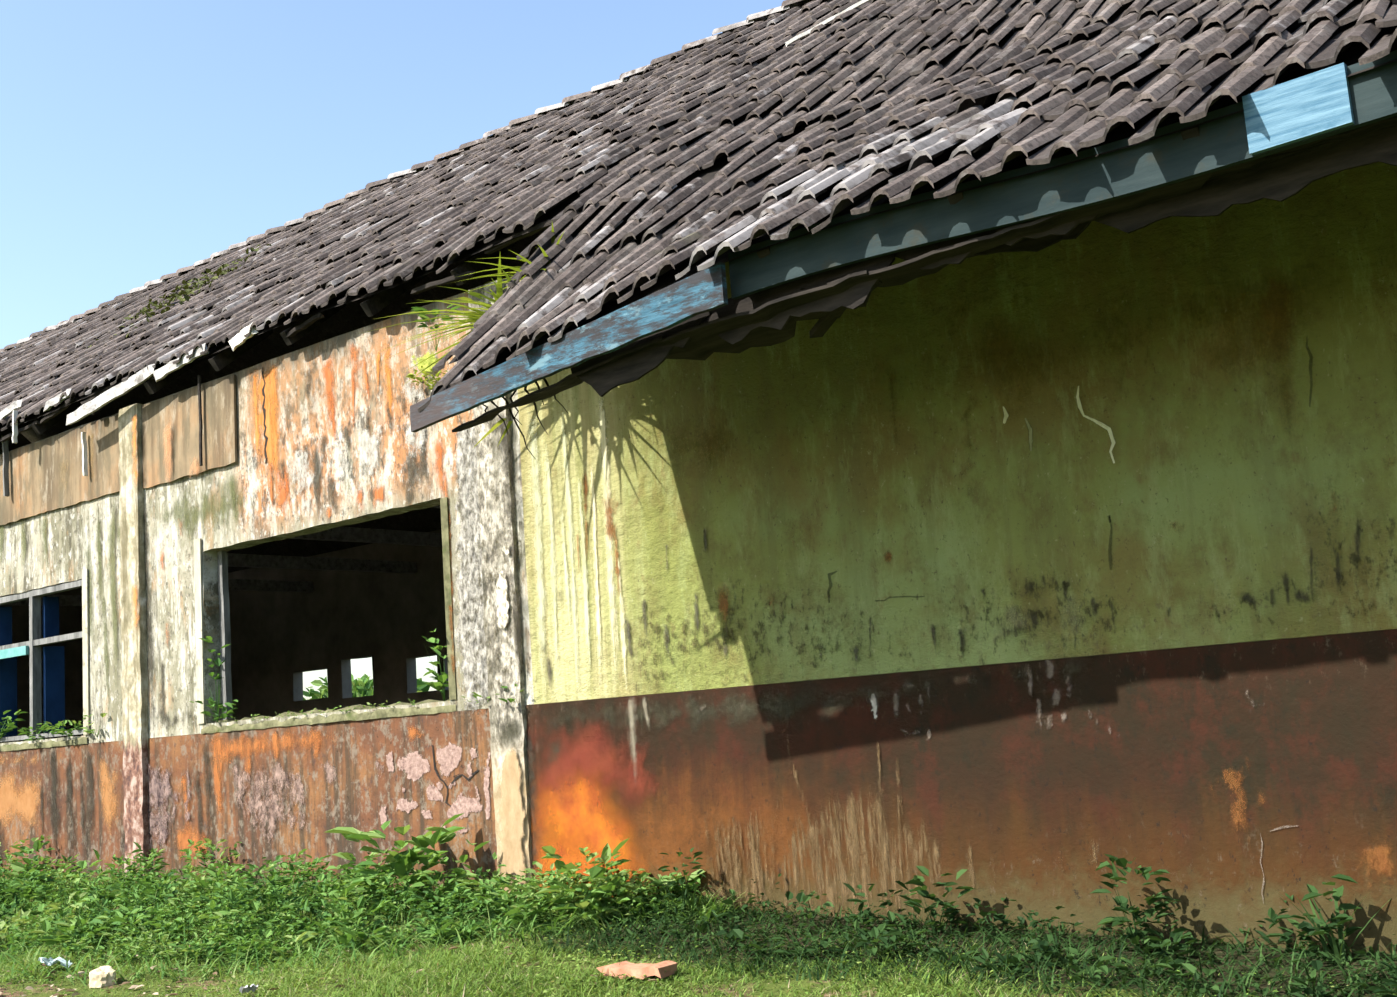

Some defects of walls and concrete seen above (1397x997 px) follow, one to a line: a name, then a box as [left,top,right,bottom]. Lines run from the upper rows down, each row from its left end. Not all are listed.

corrosion [253,368,289,506]
corrosion [323,361,335,434]
corrosion [351,348,392,419]
corrosion [435,442,447,497]
leakage [21,519,47,559]
leakage [86,526,108,685]
leakage [455,426,488,710]
leakage [959,576,1117,662]
leakage [1216,497,1397,623]
flaking render [321,761,336,784]
flaking render [375,741,526,899]
corrosion [538,771,632,898]